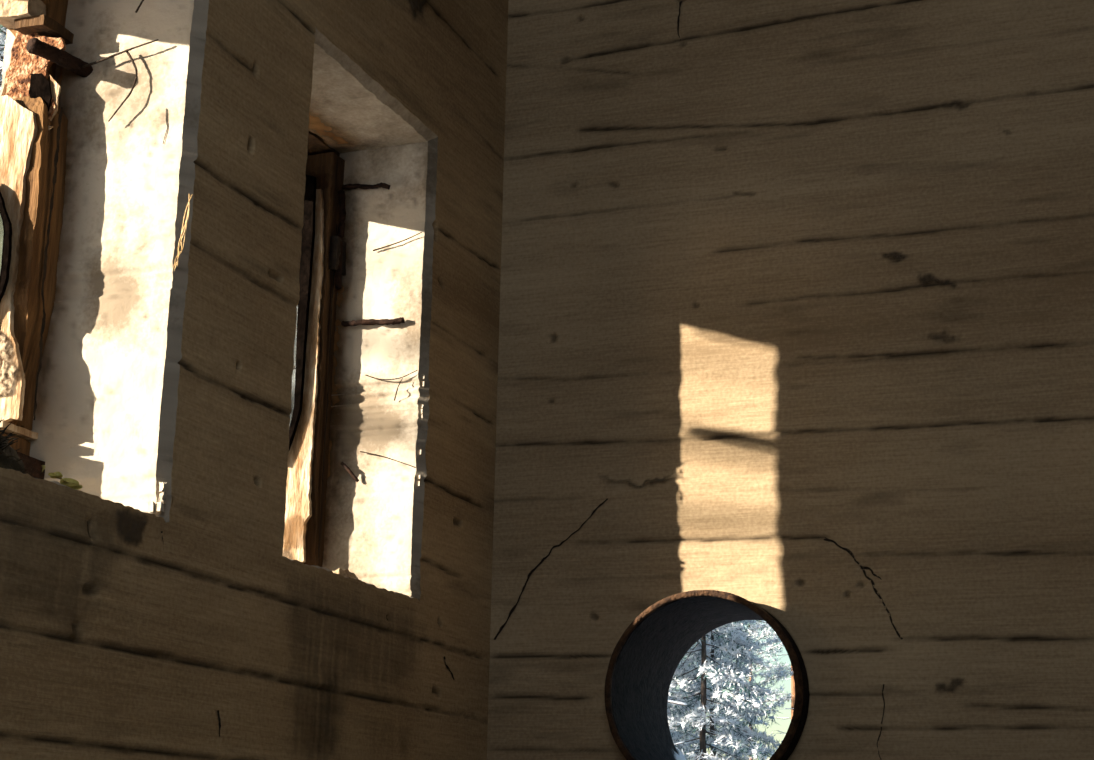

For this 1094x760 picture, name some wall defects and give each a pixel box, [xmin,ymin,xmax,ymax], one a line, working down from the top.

crack [494,498,608,640]
crack [824,537,903,640]